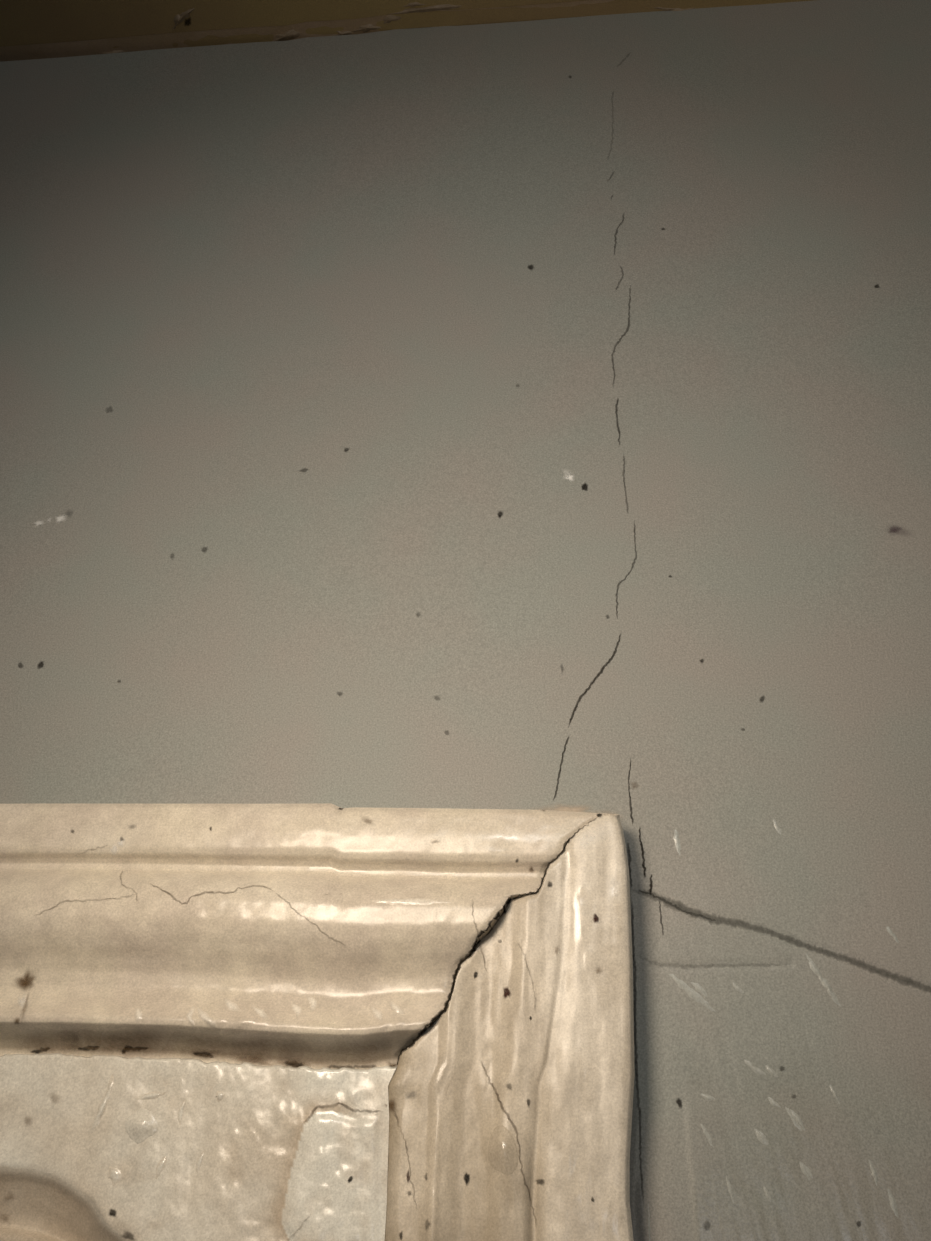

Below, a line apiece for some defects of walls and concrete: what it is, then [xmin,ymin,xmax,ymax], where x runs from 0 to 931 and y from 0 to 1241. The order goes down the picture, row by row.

crack [554,567,633,799]
crack [398,819,595,1058]
crack [628,761,919,986]